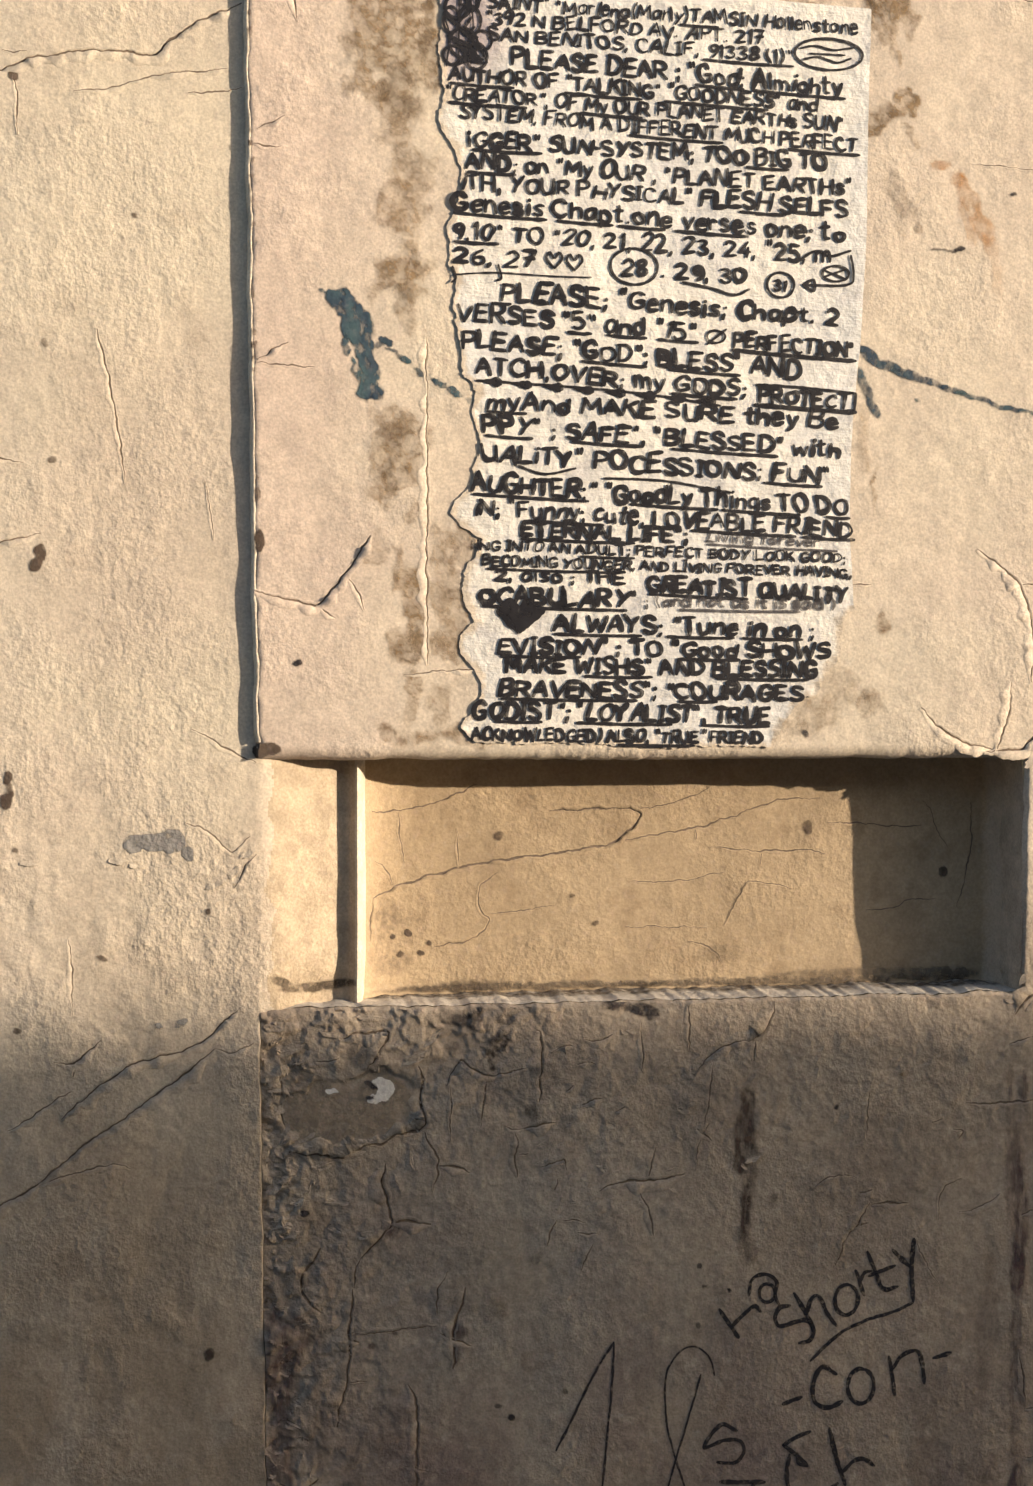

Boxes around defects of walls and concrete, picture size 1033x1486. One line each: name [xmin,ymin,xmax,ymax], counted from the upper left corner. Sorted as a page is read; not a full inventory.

crack [94,328,126,484]
damp [386,348,462,397]
crack [0,532,41,548]
crack [252,535,373,620]
crack [919,548,1033,760]
crack [368,783,922,962]
crack [65,938,75,1016]
peeling [263,1018,443,1275]
crack [0,1001,776,1427]
damp [734,1090,755,1238]
damp [1010,1150,1028,1293]
peeling [264,1290,319,1480]